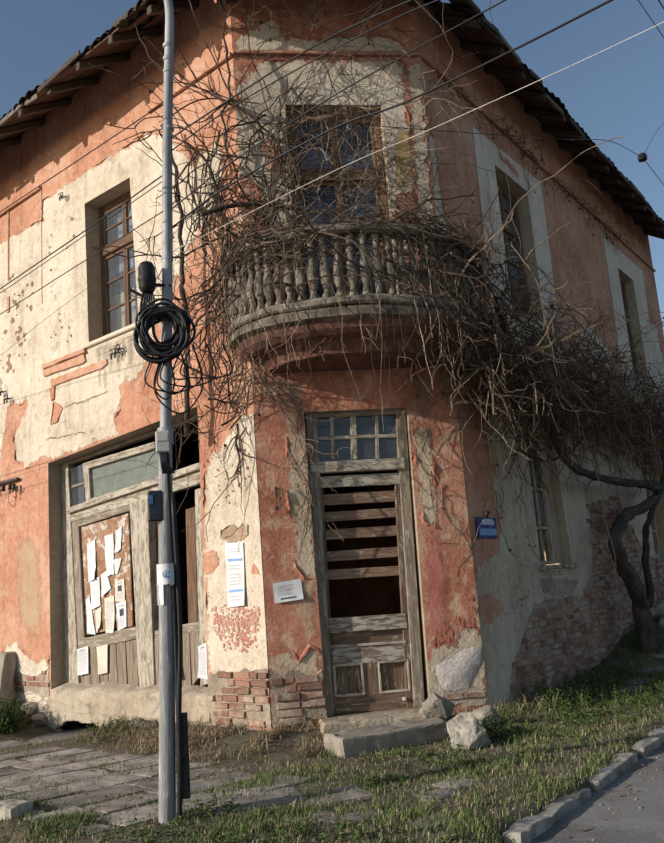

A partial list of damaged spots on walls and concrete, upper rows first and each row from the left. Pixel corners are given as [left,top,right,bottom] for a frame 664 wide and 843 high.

peeling [235,15,447,232]
peeling [0,130,227,469]
flaking render [0,642,159,731]
peeling [190,413,420,731]
peeling [427,390,664,707]